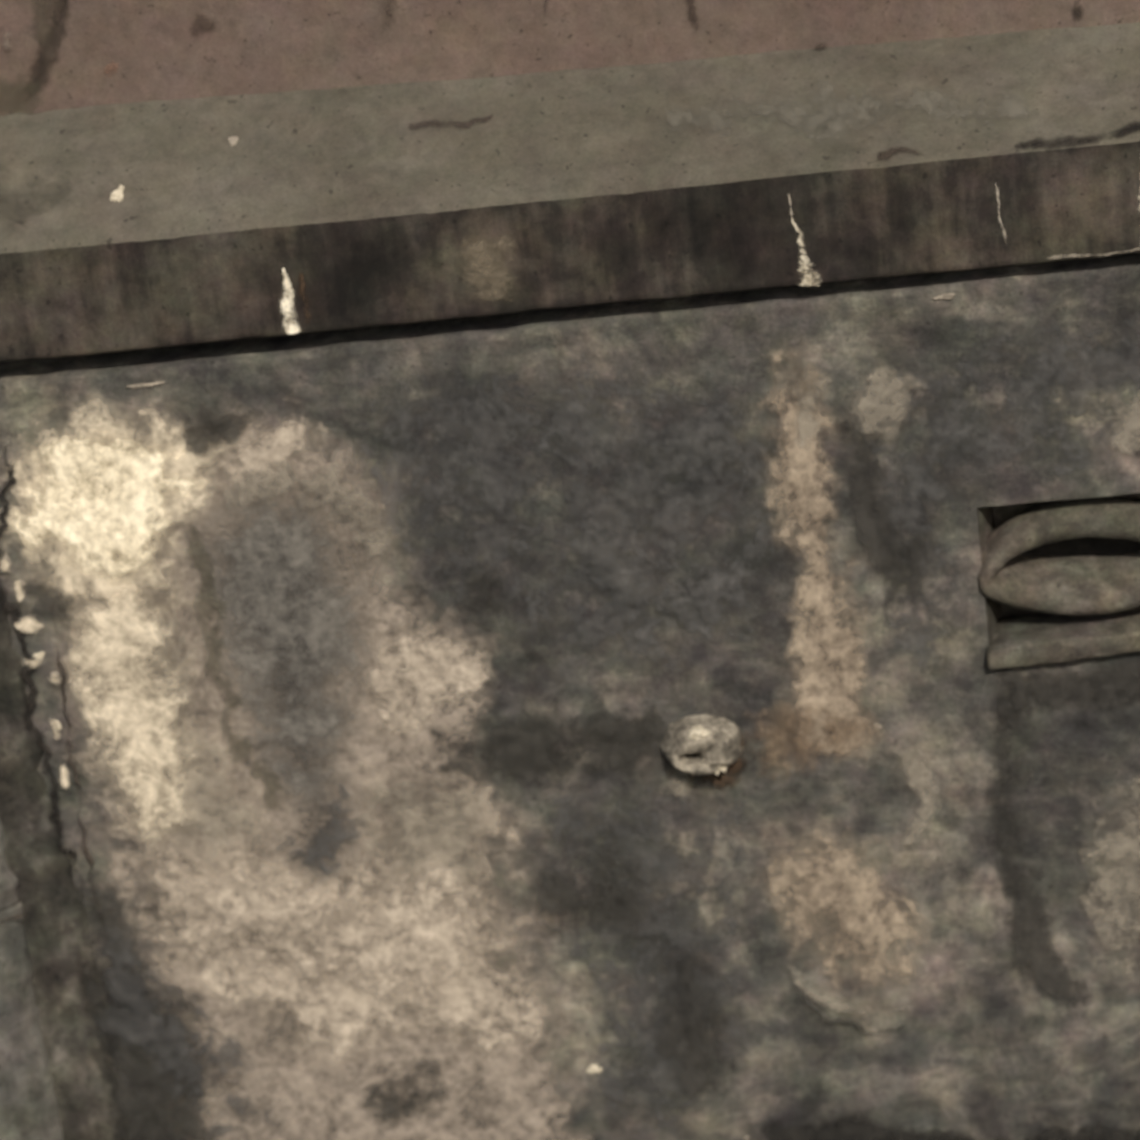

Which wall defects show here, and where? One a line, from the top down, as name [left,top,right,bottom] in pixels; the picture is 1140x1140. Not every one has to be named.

crack [27,0,68,95]
efflorescence [788,193,817,286]
efflorescence [1050,248,1140,259]
efflorescence [281,268,299,334]
leakage [842,332,1140,665]
leakage [61,367,882,1140]
leakage [901,754,939,844]
leakage [988,660,1140,1005]
leakage [769,830,919,986]
leakage [763,1114,977,1140]
leakage [1025,1123,1140,1140]